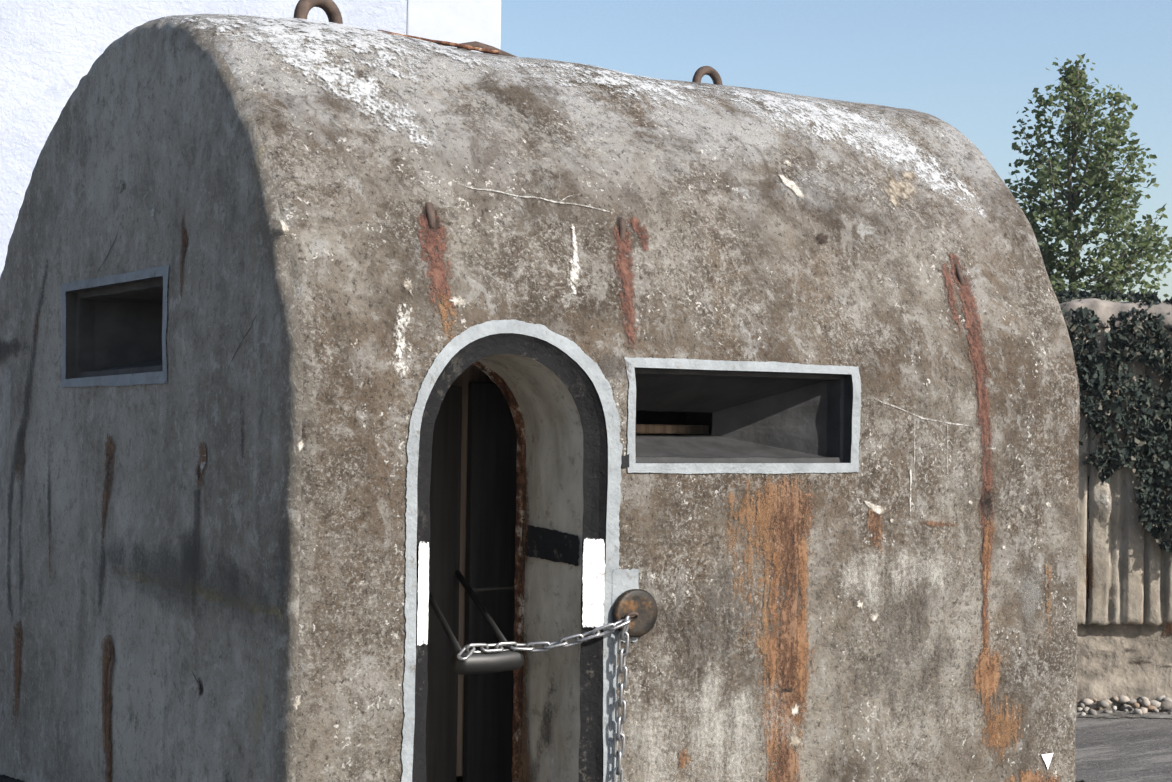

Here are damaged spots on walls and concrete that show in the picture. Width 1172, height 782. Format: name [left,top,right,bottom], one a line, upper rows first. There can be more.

rust [418,202,455,338]
rust [612,217,649,347]
rust [98,434,114,605]
rust [192,443,207,601]
rust [943,254,1023,759]
rust [13,622,23,718]
rust [101,636,115,782]
rust [727,478,816,782]